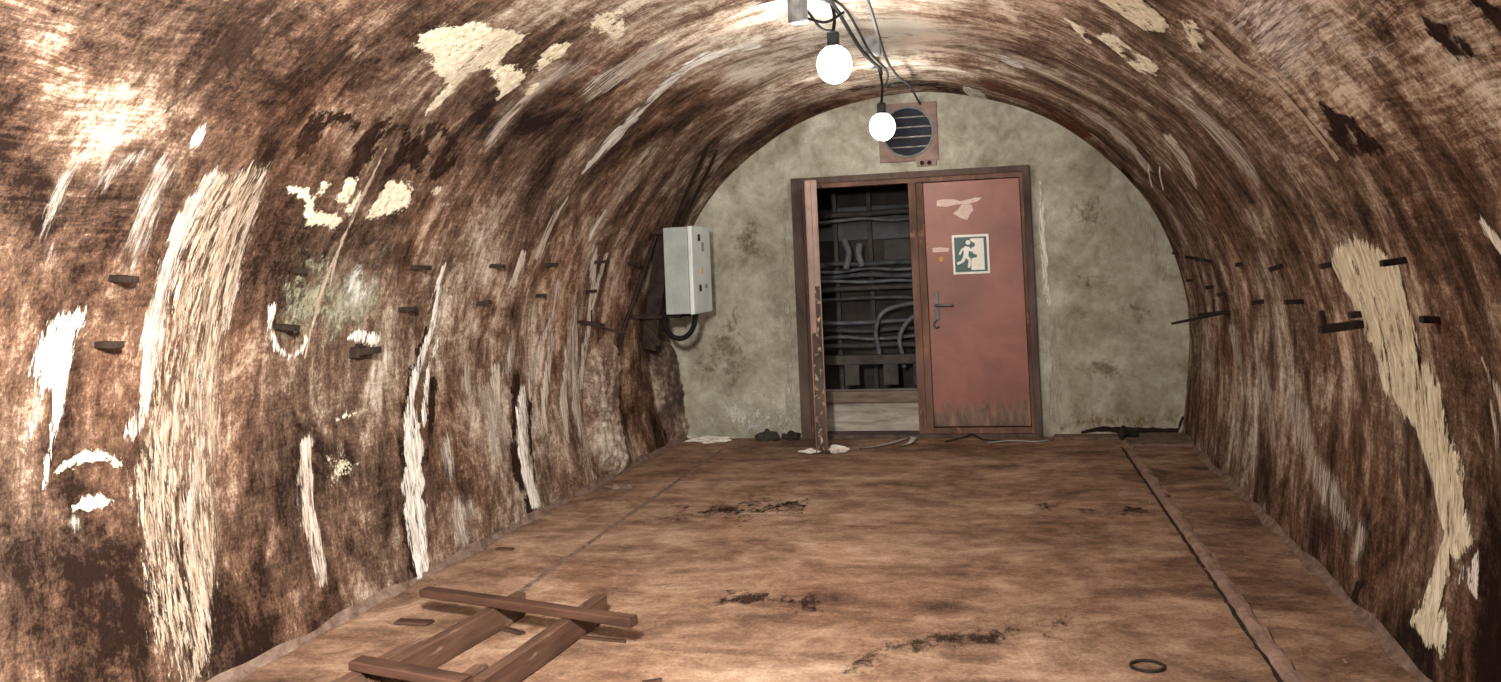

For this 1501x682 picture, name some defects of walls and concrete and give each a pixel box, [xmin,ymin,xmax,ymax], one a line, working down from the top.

peeling [413,20,573,116]
peeling [589,9,630,43]
peeling [999,55,1025,68]
peeling [1062,16,1163,77]
peeling [1099,0,1204,53]
peeling [1214,0,1402,84]
peeling [286,176,449,229]
peeling [55,449,123,474]
peeling [71,493,114,533]